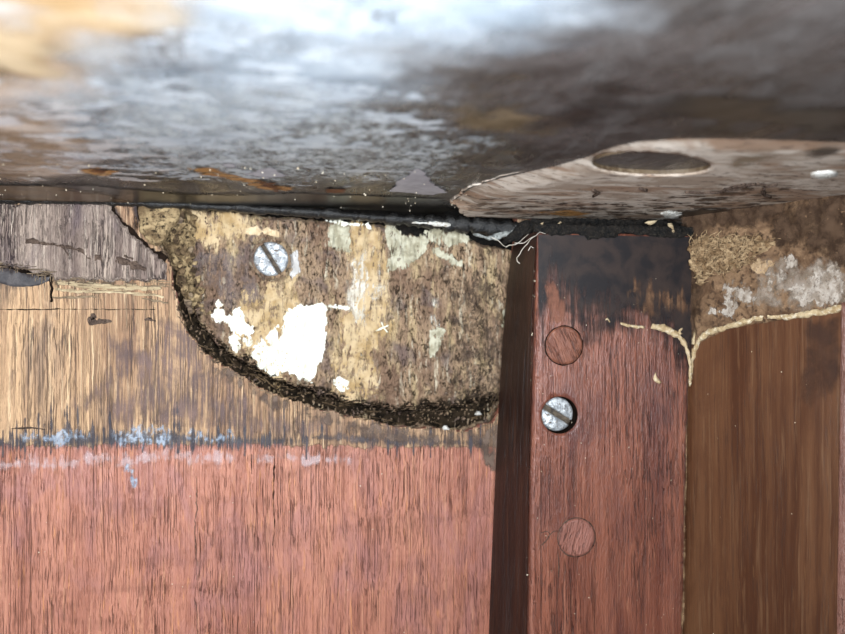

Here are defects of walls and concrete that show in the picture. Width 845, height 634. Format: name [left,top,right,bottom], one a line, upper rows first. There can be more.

peeling [0,48,445,186]
peeling [311,138,845,223]
damp [0,269,503,471]
peeling [0,206,512,449]
damp [538,234,692,368]
peeling [708,254,845,318]